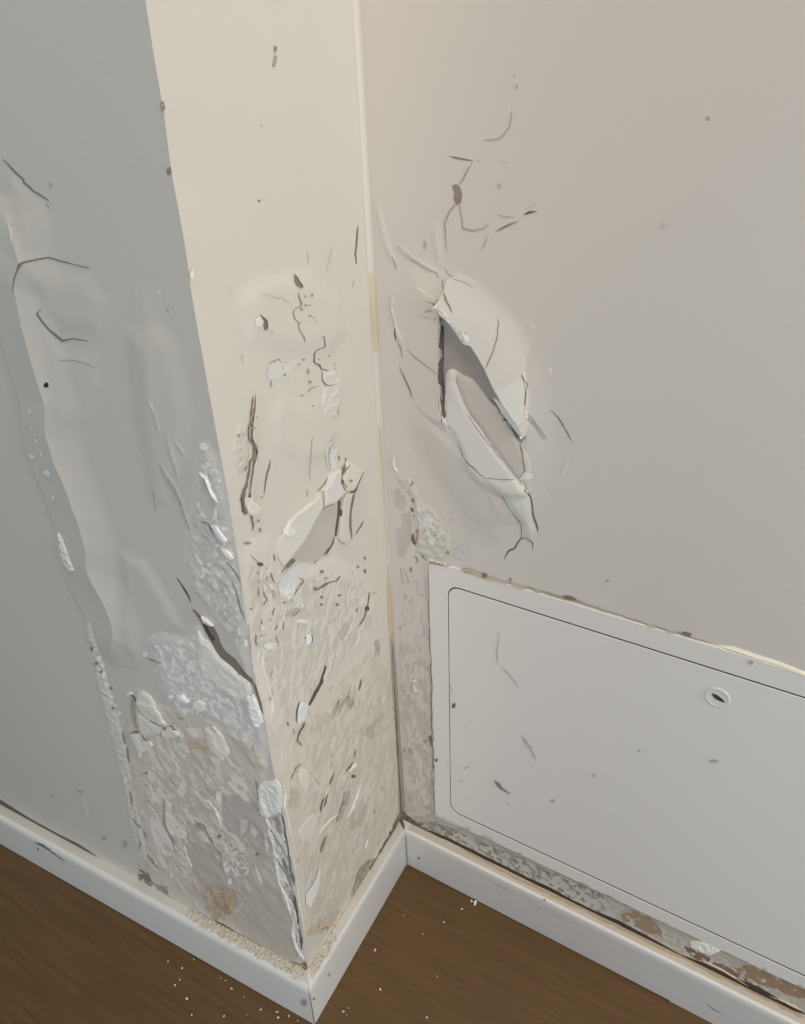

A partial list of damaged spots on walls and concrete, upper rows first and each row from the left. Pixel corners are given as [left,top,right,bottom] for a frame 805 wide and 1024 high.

crack [2,159,49,201]
crack [12,257,90,291]
crack [36,309,94,368]
spalling [86,422,402,962]
crack [152,438,364,714]
crack [240,292,339,530]
peeling [298,355,342,419]
crack [0,556,805,1024]
peeling [393,457,451,562]
peeling [389,274,539,542]
crack [390,75,572,559]
flaking render [689,940,722,955]